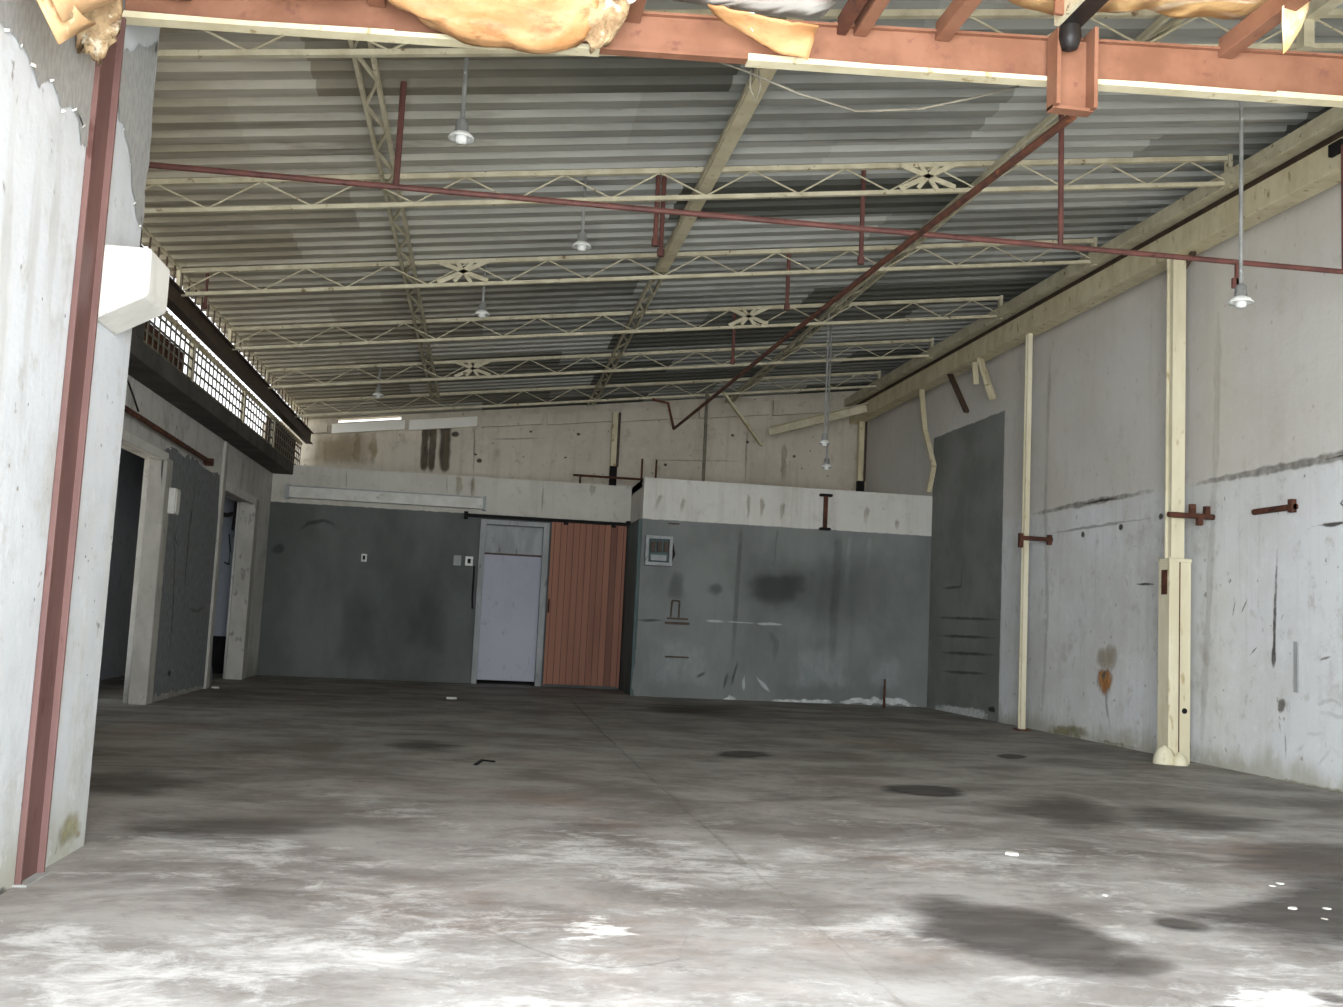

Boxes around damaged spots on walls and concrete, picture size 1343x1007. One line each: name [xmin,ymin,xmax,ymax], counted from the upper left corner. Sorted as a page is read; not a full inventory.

peeling [0,0,95,146]
peeling [119,41,158,229]
rust [1097,669,1112,693]